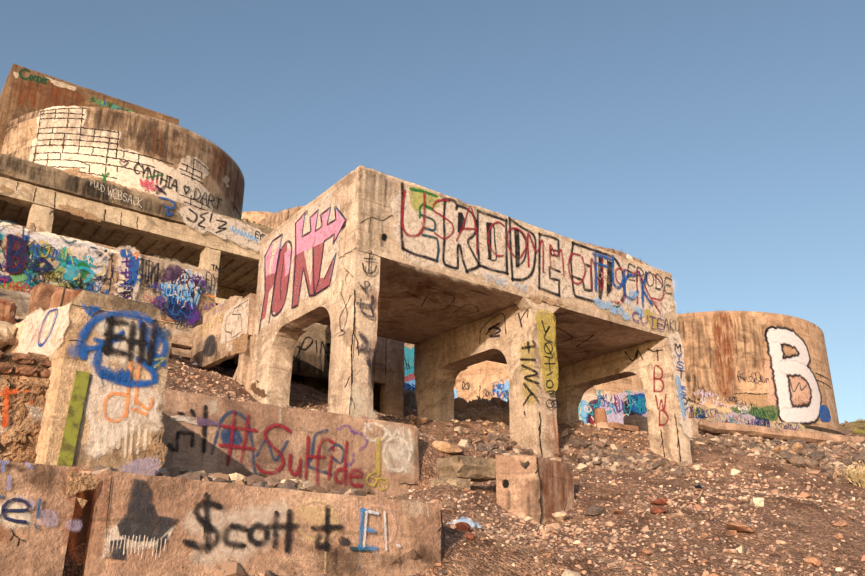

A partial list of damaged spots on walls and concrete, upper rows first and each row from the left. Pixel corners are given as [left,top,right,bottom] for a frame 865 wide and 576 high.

spalling [0,379,44,463]
crack [535,412,543,524]